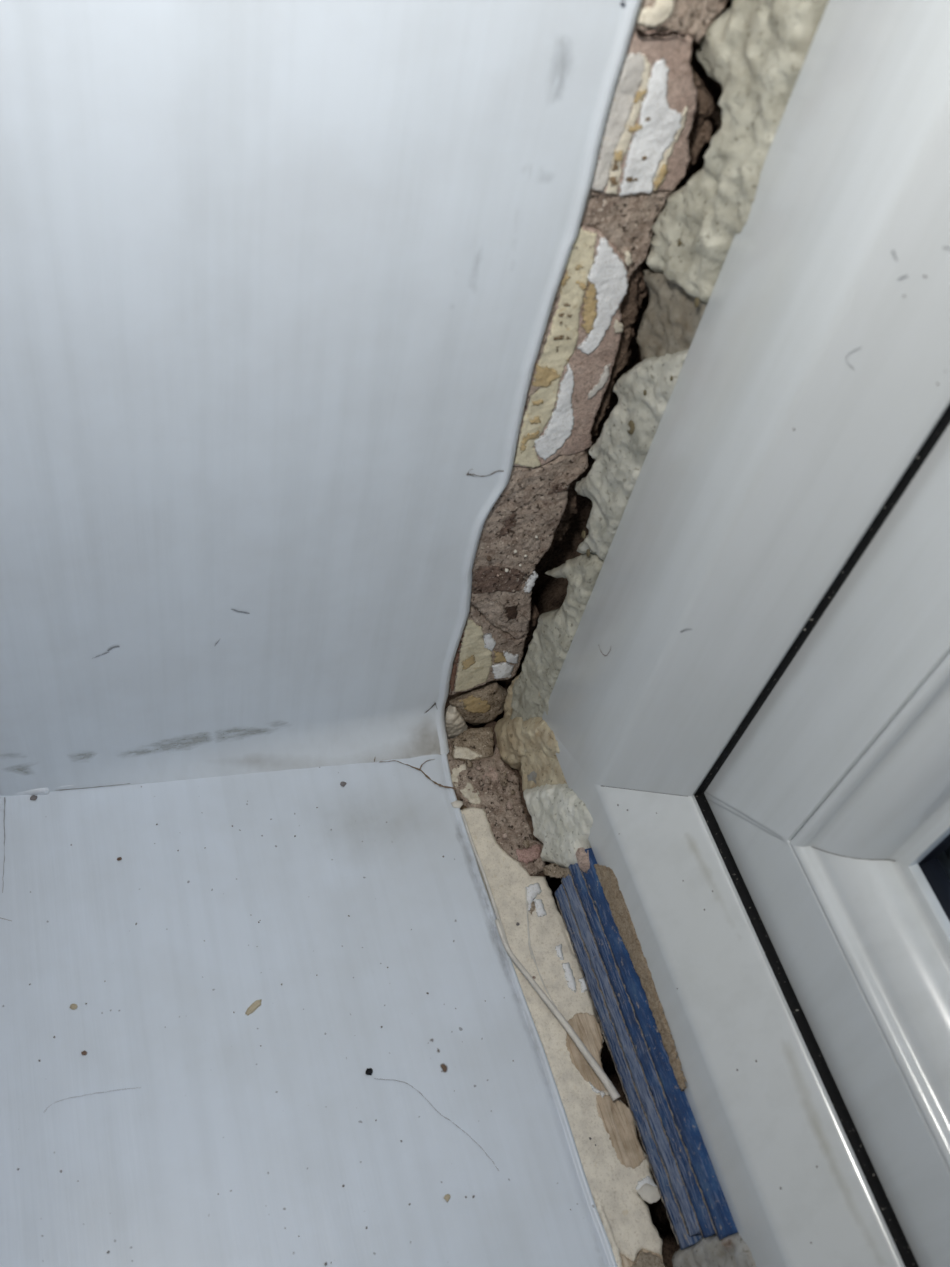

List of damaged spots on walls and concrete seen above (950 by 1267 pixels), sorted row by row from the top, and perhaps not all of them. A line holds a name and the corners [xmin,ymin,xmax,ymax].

peeling [448,0,728,695]
peeling [447,738,680,1267]